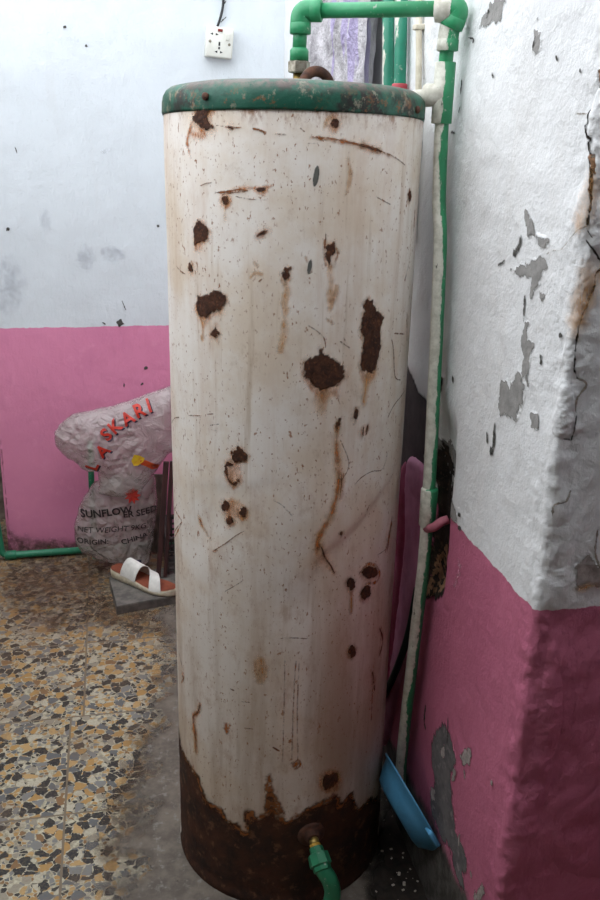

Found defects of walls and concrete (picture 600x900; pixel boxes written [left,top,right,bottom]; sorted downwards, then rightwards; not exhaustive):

peeling [479,0,507,29]
peeling [532,16,543,57]
peeling [486,209,551,455]
crack [547,110,600,440]
crack [551,490,571,516]
peeling [424,705,486,900]